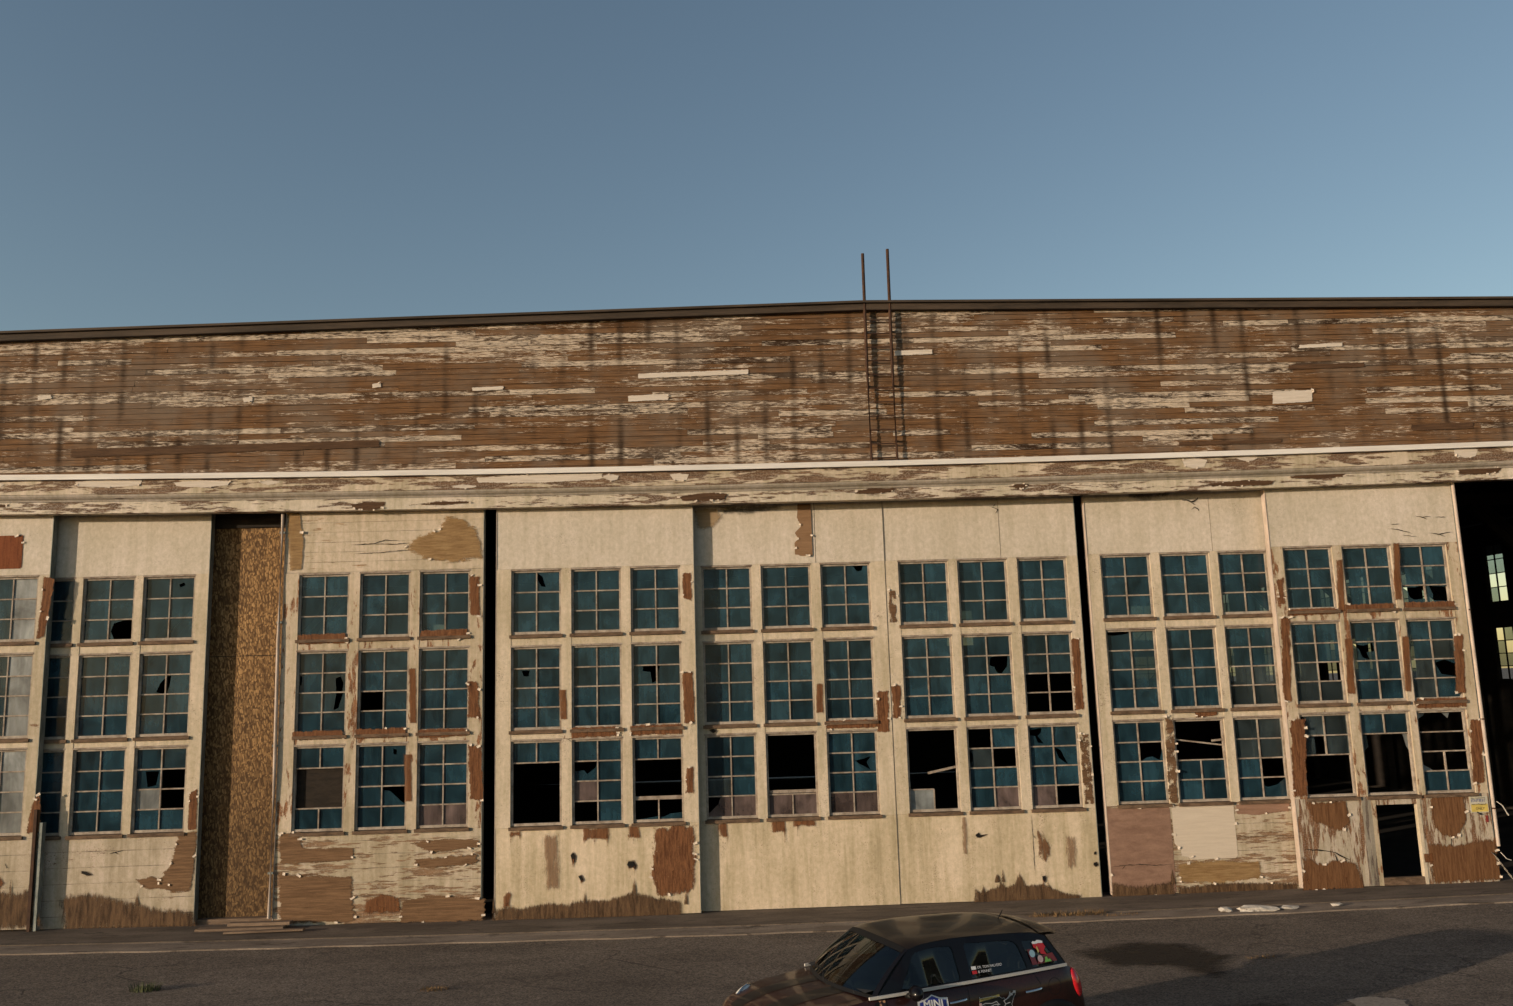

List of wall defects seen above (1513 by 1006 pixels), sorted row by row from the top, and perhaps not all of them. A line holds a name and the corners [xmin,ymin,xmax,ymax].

peeling [1208,457,1346,487]
peeling [1454,454,1501,475]
peeling [673,474,727,502]
peeling [351,501,386,511]
peeling [404,484,484,641]
peeling [277,831,357,925]
peeling [410,838,480,869]
peeling [626,825,698,897]
peeling [1172,833,1263,885]
peeling [1301,857,1364,890]
peeling [399,894,486,923]